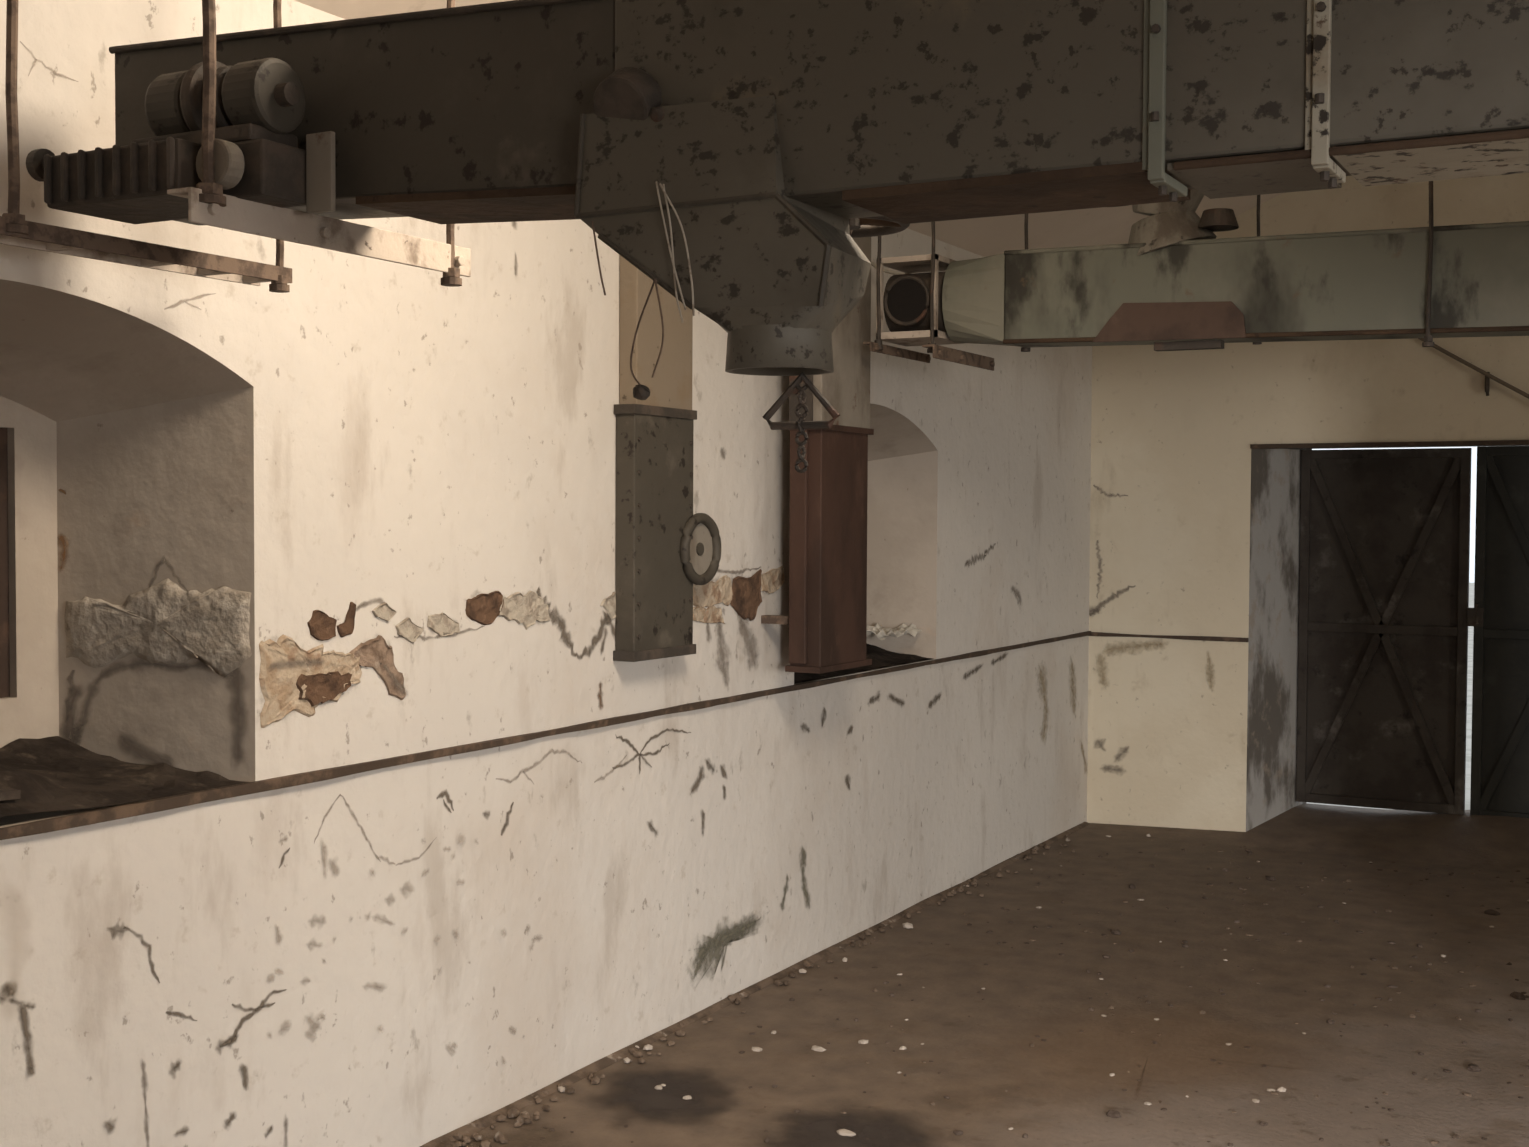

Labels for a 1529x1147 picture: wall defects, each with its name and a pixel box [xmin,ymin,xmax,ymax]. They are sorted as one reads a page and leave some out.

flaking render [693,566,785,624]
flaking render [259,591,550,728]
peeling [65,662,210,744]
crack [500,729,691,783]
water stain [695,918,756,975]